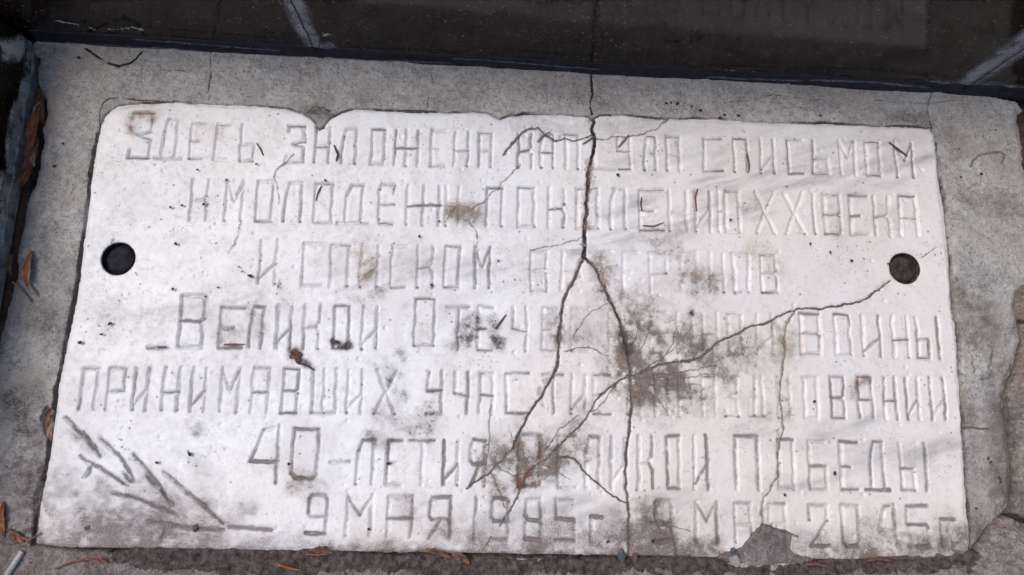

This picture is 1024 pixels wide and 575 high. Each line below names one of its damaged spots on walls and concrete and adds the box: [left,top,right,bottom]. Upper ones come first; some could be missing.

crack [415,75,891,556]